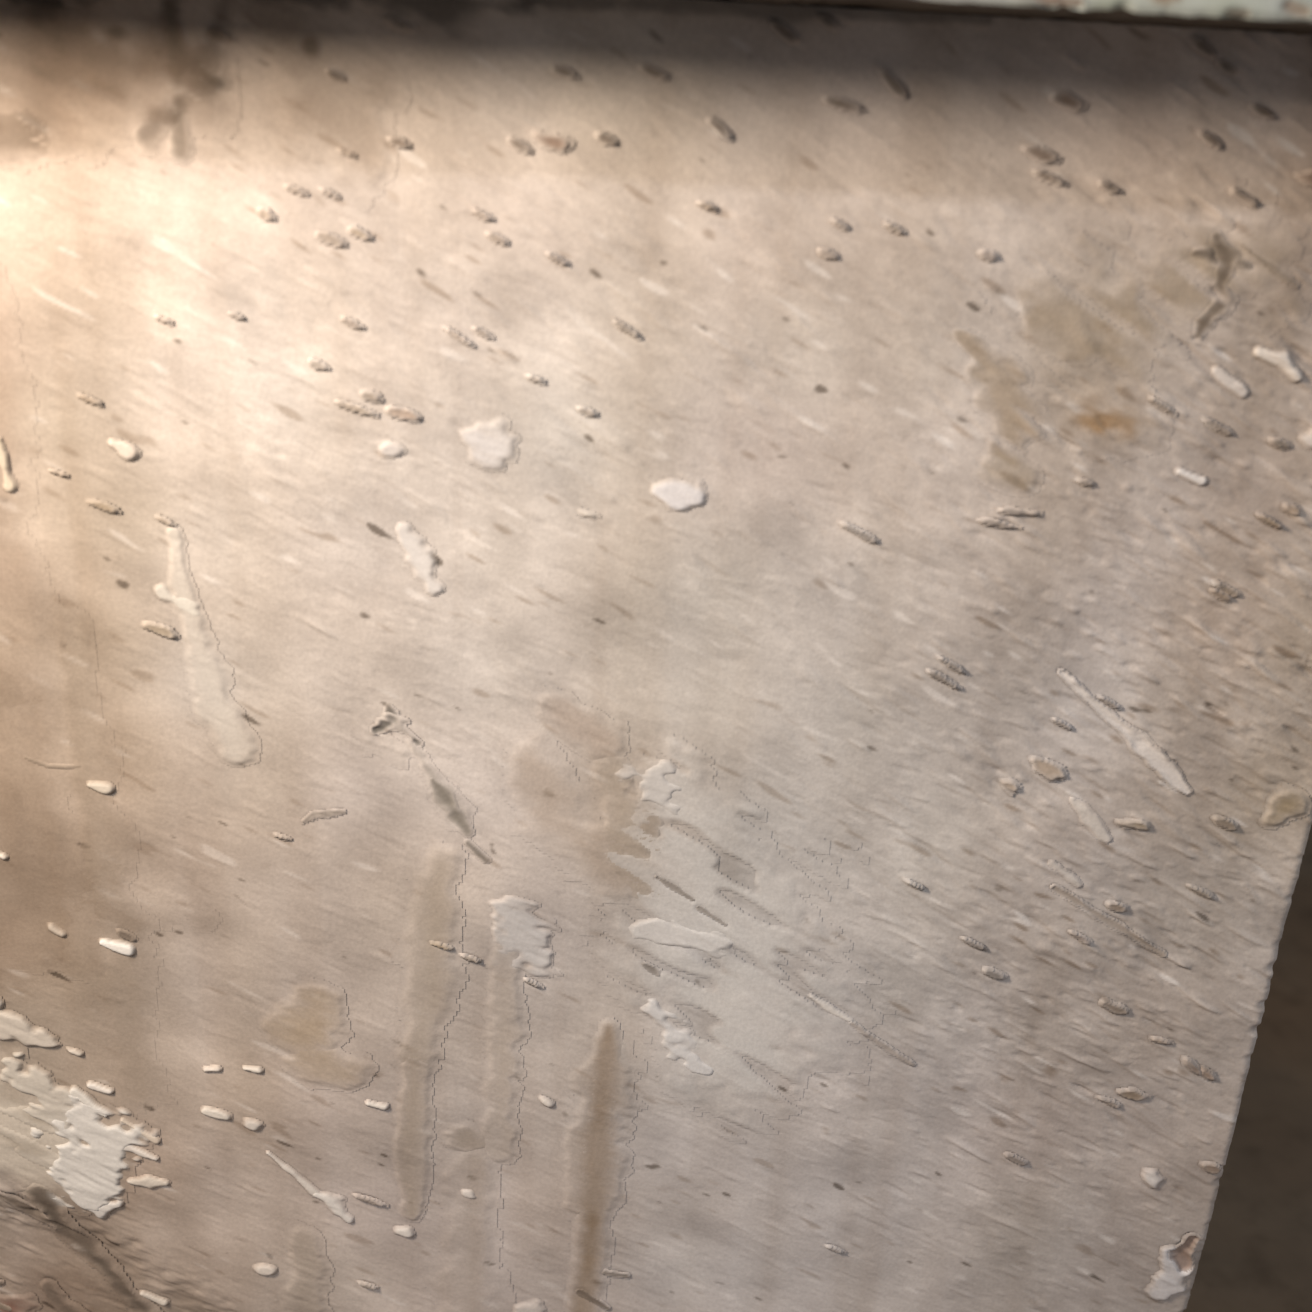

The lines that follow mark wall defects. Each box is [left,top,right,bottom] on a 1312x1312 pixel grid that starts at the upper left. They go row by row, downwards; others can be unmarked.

water stain [0,0,997,212]
peeling [0,435,20,493]
peeling [107,437,141,462]
peeling [456,412,521,472]
peeling [649,477,708,512]
water stain [0,295,178,1118]
water stain [501,684,665,906]
peeling [487,895,563,989]
peeling [579,733,916,1144]
peeling [0,996,171,1219]
peeling [200,1105,265,1131]
spalling [1142,1232,1203,1303]